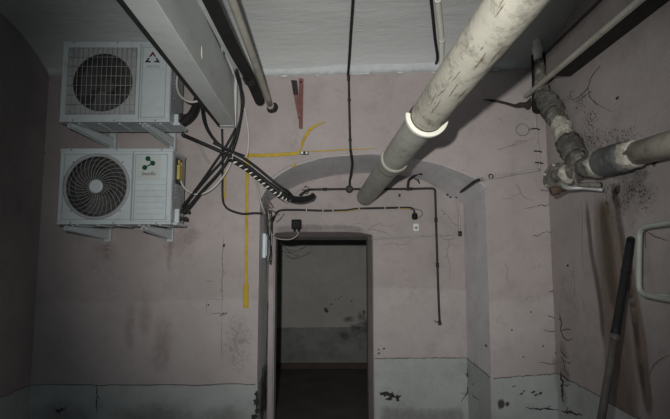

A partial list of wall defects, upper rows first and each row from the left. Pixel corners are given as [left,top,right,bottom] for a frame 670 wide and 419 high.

crack [527,316,581,416]